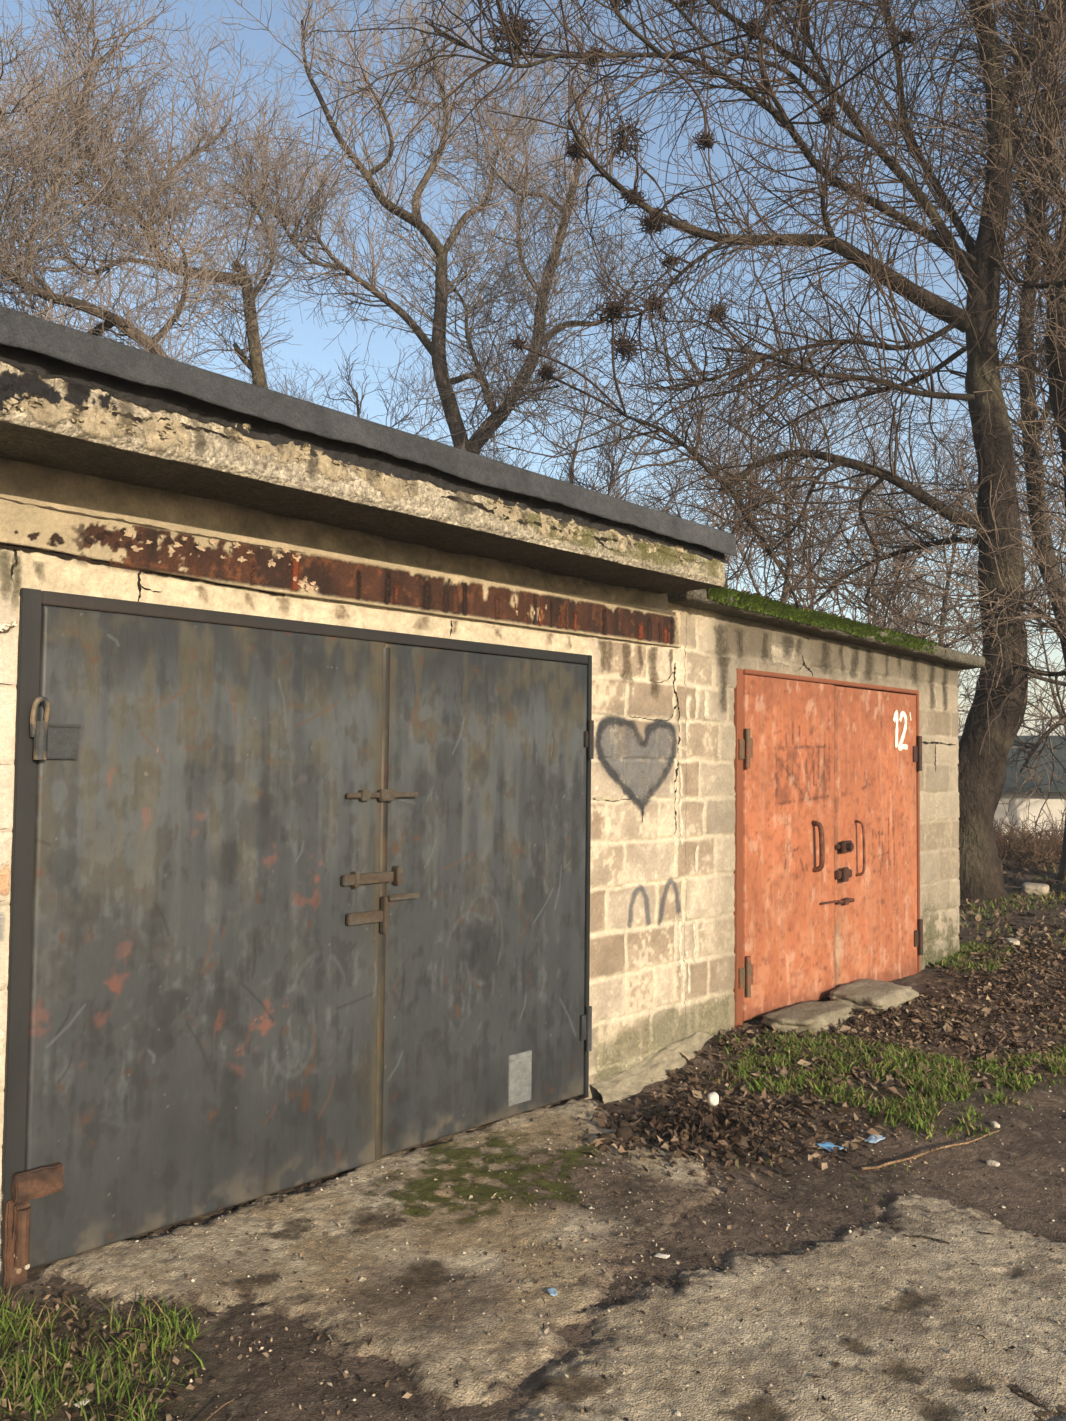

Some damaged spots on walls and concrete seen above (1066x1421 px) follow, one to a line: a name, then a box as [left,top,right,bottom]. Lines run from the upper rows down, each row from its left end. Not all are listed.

spalling [0,366,192,456]
spalling [224,423,419,502]
peeling [119,527,319,592]
spalling [489,498,586,542]
spalling [609,529,658,557]
spalling [676,545,692,566]
water stain [686,629,743,742]
water stain [820,643,948,707]
peeling [0,863,10,895]
crack [1034,1405,1066,1421]